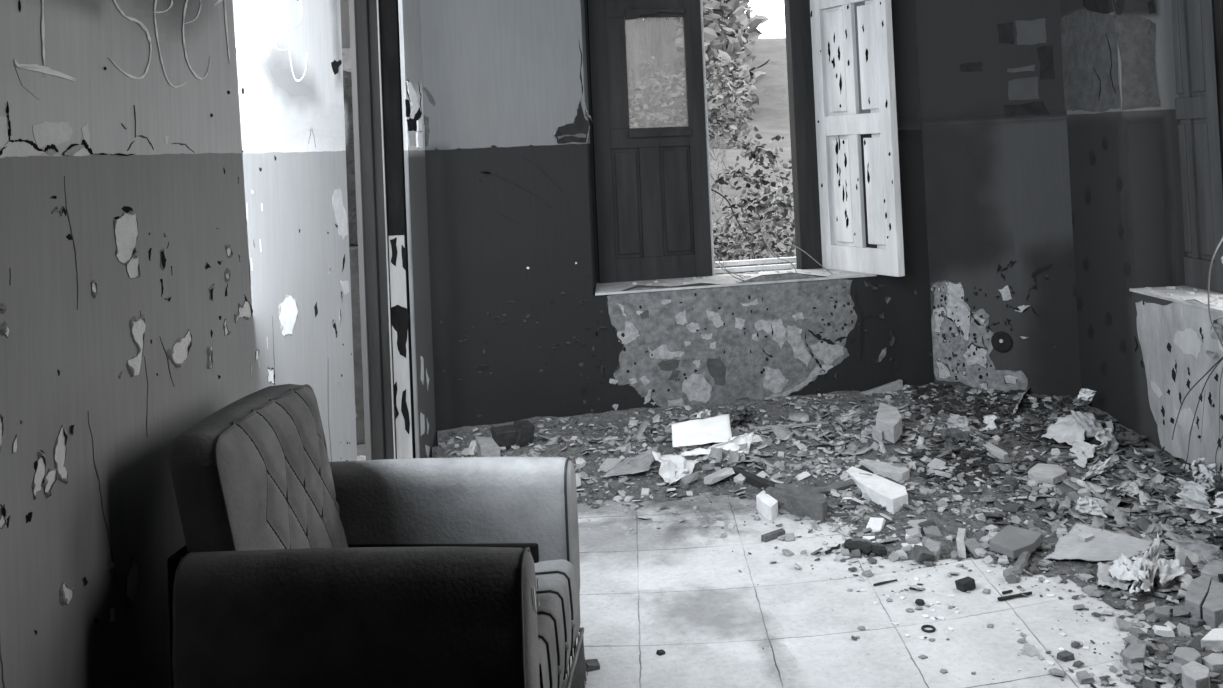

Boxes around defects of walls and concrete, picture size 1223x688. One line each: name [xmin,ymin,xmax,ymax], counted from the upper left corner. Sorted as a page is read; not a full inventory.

crack [0,102,195,310]
peeling [118,314,152,379]
peeling [113,206,172,302]
peeling [167,329,192,368]
peeling [204,244,253,379]
peeling [255,349,275,385]
peeling [278,294,299,338]
peeling [327,187,352,355]
peeling [603,273,895,407]
peeling [914,280,1031,393]
peeling [0,504,10,529]
peeling [26,424,75,523]